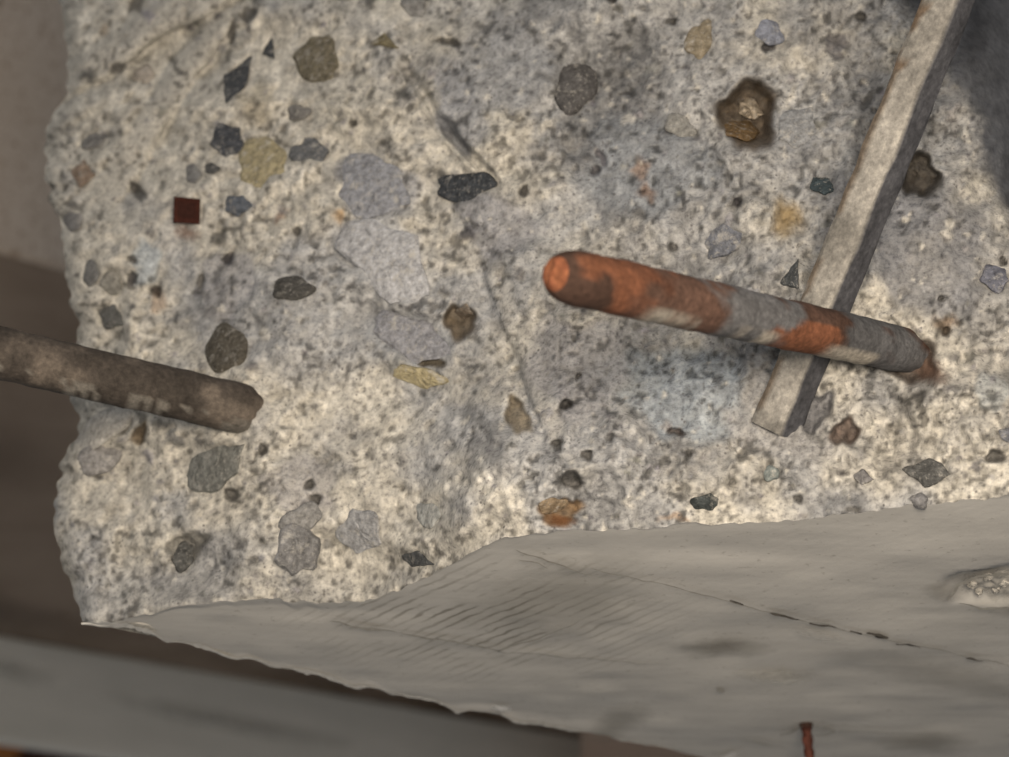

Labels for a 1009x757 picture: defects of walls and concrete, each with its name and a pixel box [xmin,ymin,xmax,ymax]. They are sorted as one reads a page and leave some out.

spalling [44,0,1009,623]
corrosion [921,359,940,380]
crack [515,549,1009,666]
spalling [88,622,163,640]
spalling [172,641,275,667]
spalling [285,668,480,714]